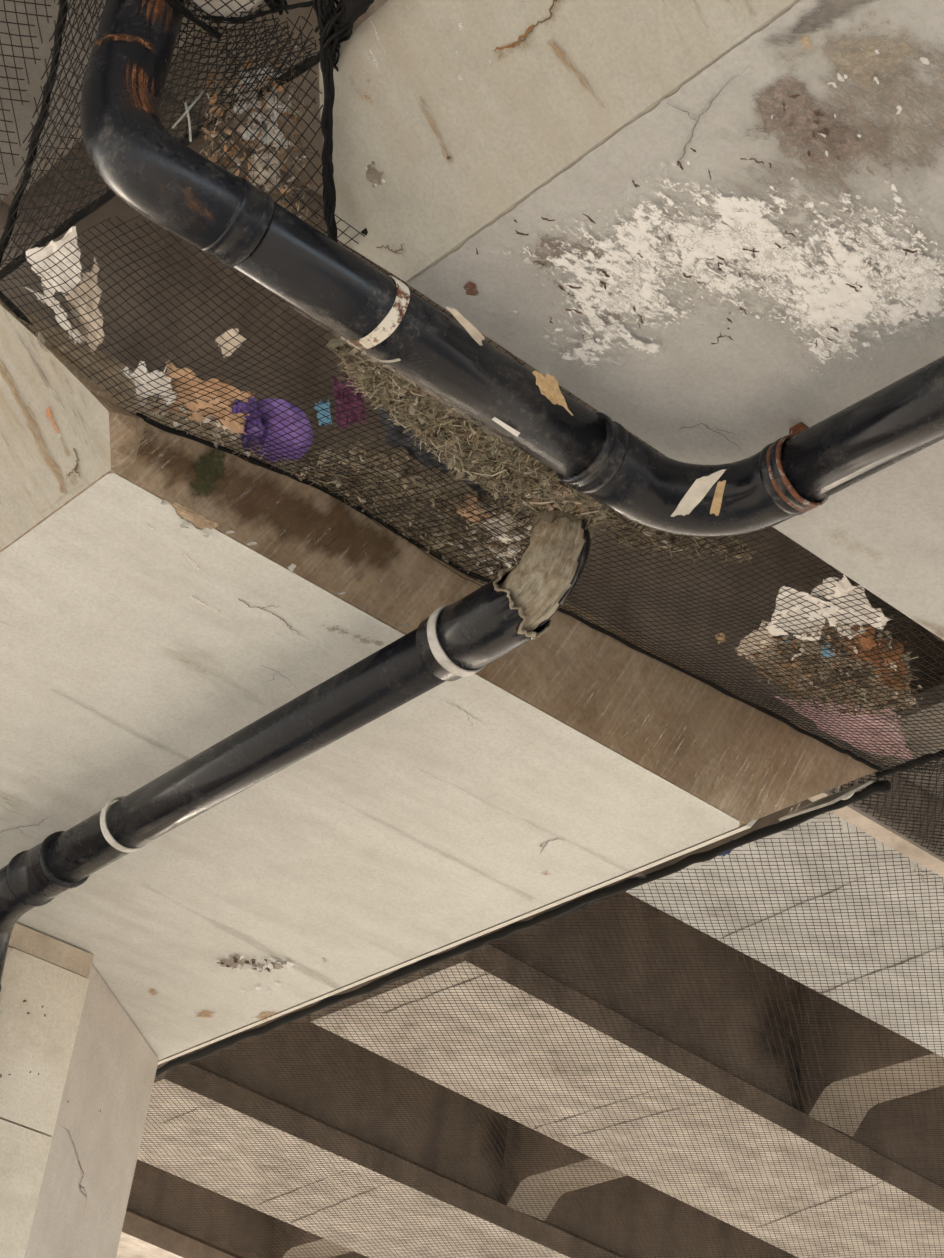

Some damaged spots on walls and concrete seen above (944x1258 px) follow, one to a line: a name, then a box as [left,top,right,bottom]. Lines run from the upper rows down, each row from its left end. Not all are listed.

crack [492,0,557,52]
crack [664,62,753,160]
water stain [765,0,944,234]
peeling [219,955,295,996]